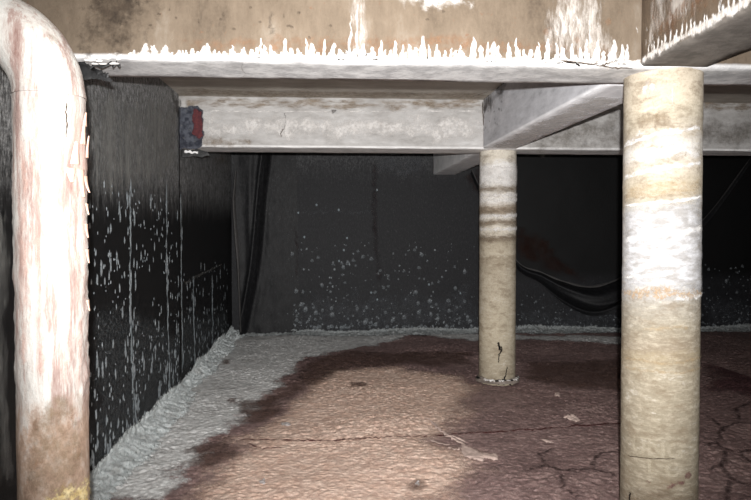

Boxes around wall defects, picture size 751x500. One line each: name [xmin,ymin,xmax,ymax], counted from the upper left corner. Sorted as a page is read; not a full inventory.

damp [121,0,750,64]
damp [208,90,502,142]
peeling [65,112,91,215]
damp [45,99,479,500]
crack [497,342,511,386]
damp [528,359,621,389]
damp [705,364,751,396]
crack [241,423,621,449]